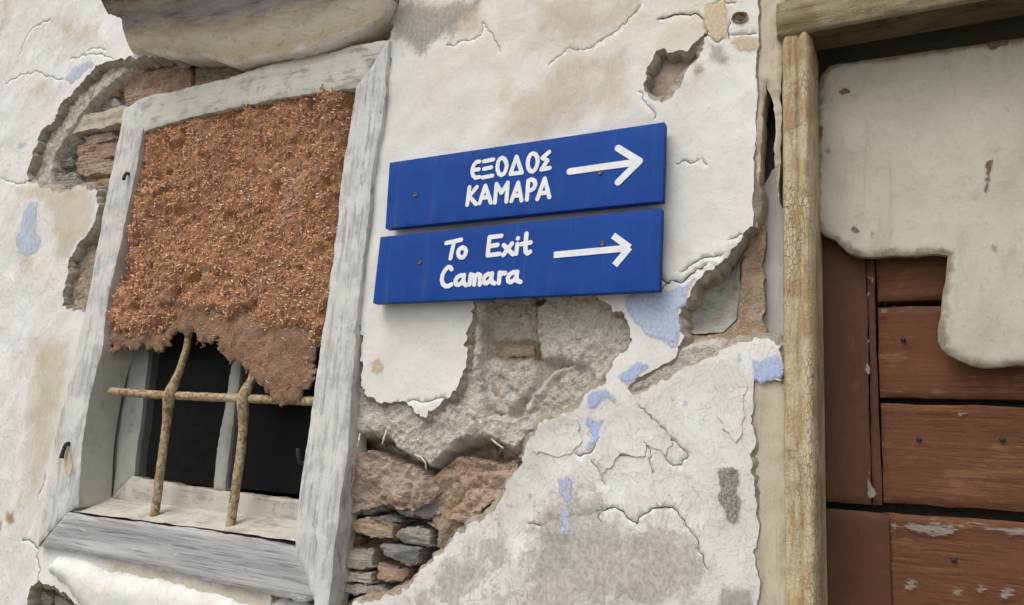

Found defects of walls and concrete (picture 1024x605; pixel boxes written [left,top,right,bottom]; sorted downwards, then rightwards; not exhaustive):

crack [557,0,754,58]
spalling [651,59,689,97]
spalling [36,63,245,203]
spalling [72,244,98,309]
spalling [631,225,769,392]
spalling [344,297,631,605]
peeling [585,405,673,474]
crack [621,408,688,471]
spalling [717,467,741,523]
peeling [516,479,703,605]
crack [598,506,706,567]